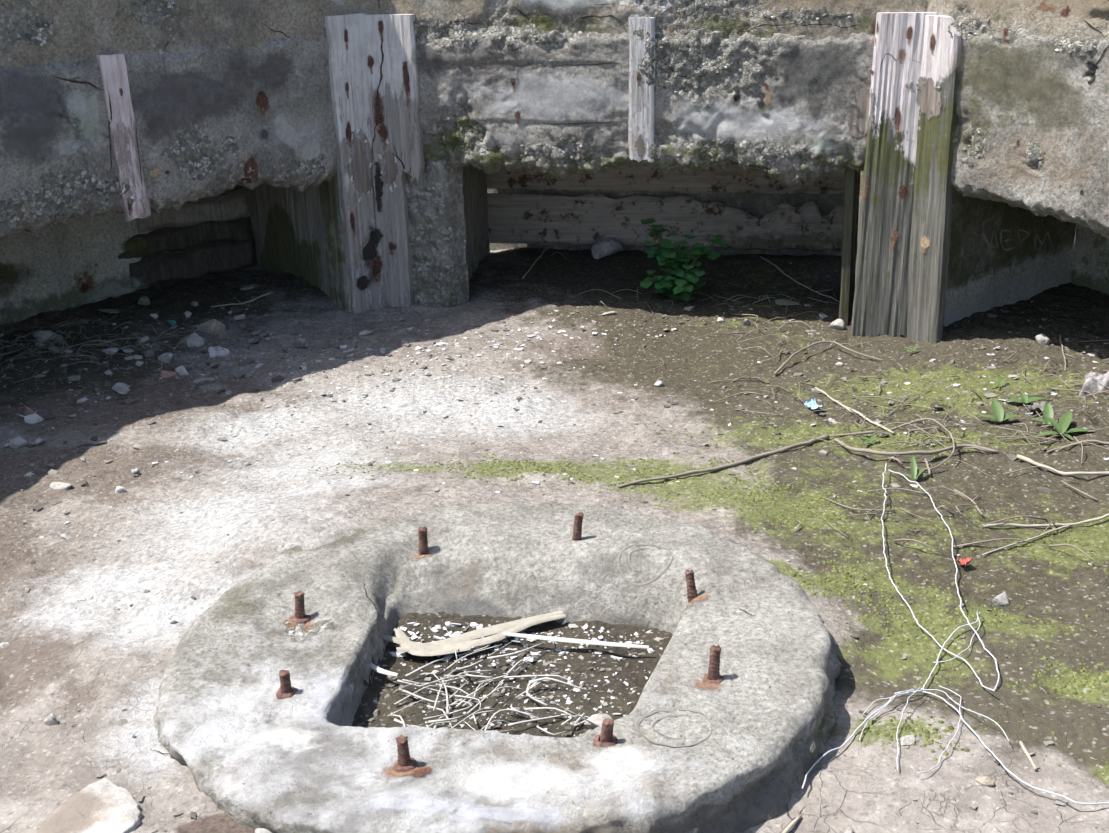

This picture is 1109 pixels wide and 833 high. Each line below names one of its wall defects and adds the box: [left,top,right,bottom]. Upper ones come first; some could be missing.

leakage [0,73,101,153]
spalling [161,128,238,183]
spalling [433,120,492,167]
spalling [512,136,599,167]
spalling [627,127,668,163]
spalling [676,131,844,172]
leakage [957,109,991,149]
leakage [1031,79,1081,124]
corrosion [386,767,431,777]